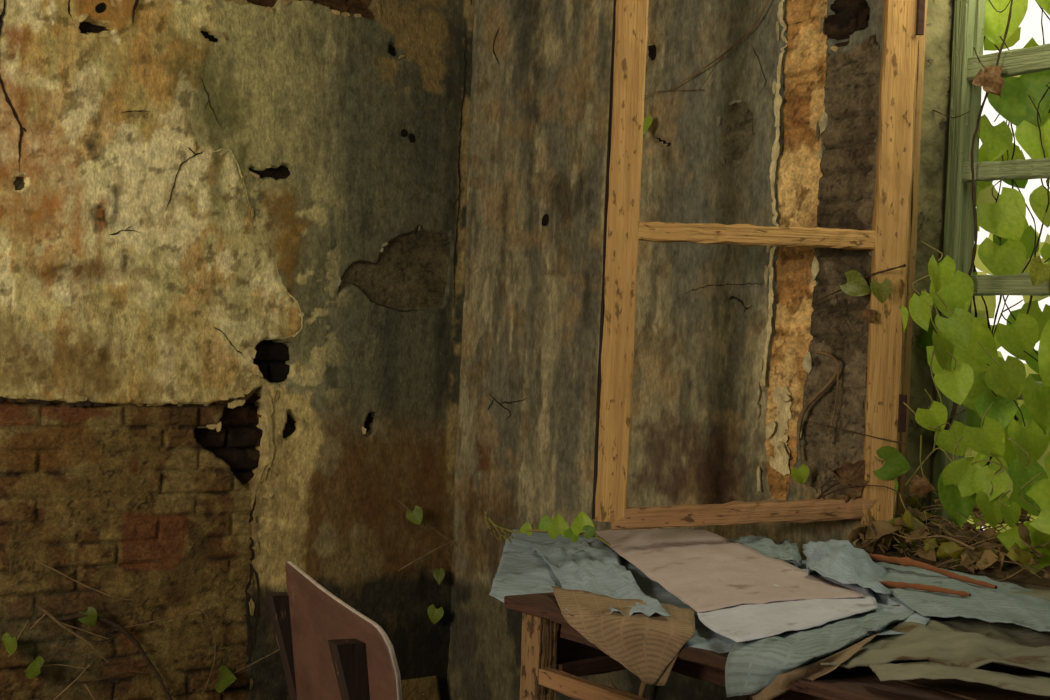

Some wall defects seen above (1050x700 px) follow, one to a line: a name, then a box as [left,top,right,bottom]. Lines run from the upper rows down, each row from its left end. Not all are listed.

crack [0,0,8,35]
flaking render [224,0,381,20]
crack [0,76,26,172]
crack [200,76,220,125]
flaking render [769,0,880,231]
crack [165,147,208,212]
flaking render [218,148,290,217]
flaking render [755,246,872,501]
flaking render [0,243,304,700]